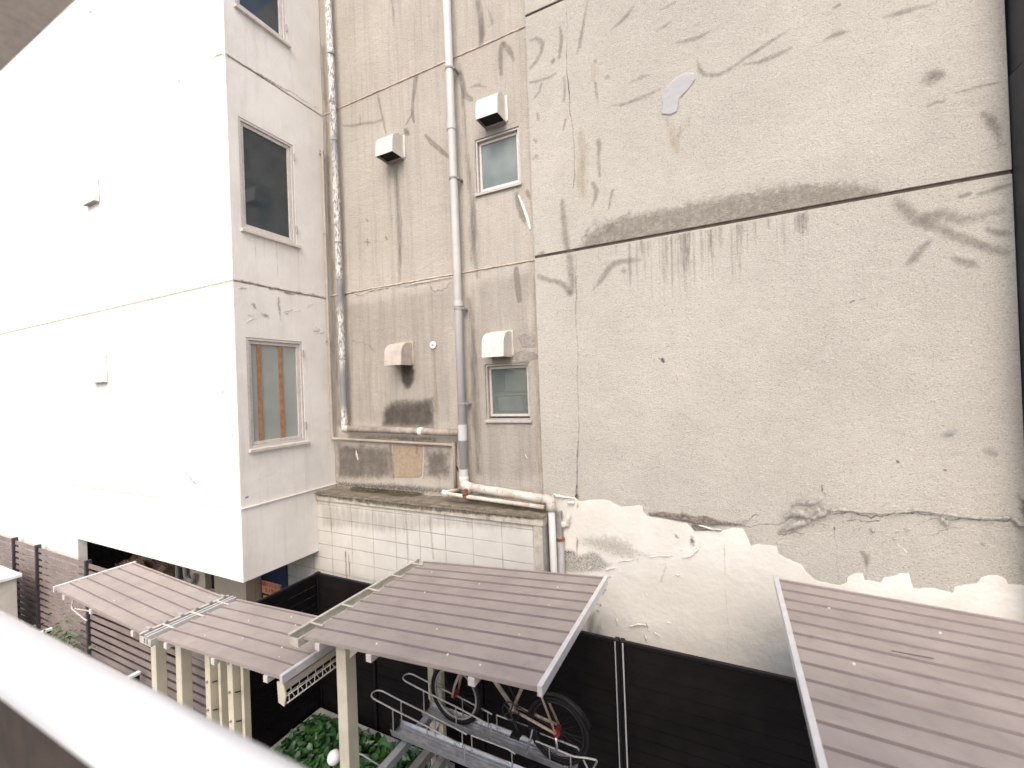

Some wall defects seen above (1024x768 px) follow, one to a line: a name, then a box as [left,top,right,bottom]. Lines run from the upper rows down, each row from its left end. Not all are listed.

damp [317,446,532,519]
spalling [649,512,746,531]
spalling [781,499,831,531]